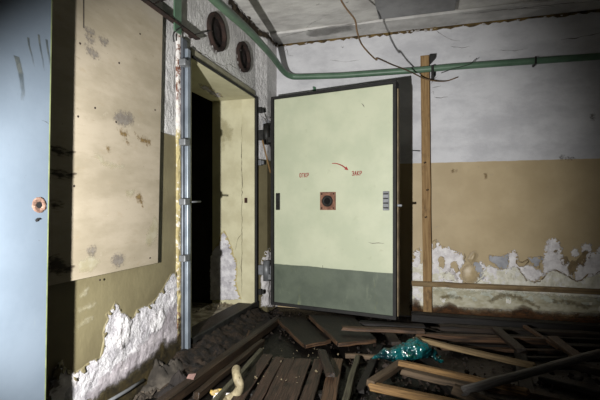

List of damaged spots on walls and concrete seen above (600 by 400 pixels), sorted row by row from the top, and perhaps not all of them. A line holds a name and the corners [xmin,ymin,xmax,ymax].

water stain [114,112,133,125]
peeling [210,230,241,300]
peeling [410,248,422,300]
water stain [409,263,423,306]
peeling [431,239,464,283]
water stain [432,261,600,316]
peeling [472,238,600,284]
peeling [49,272,178,400]